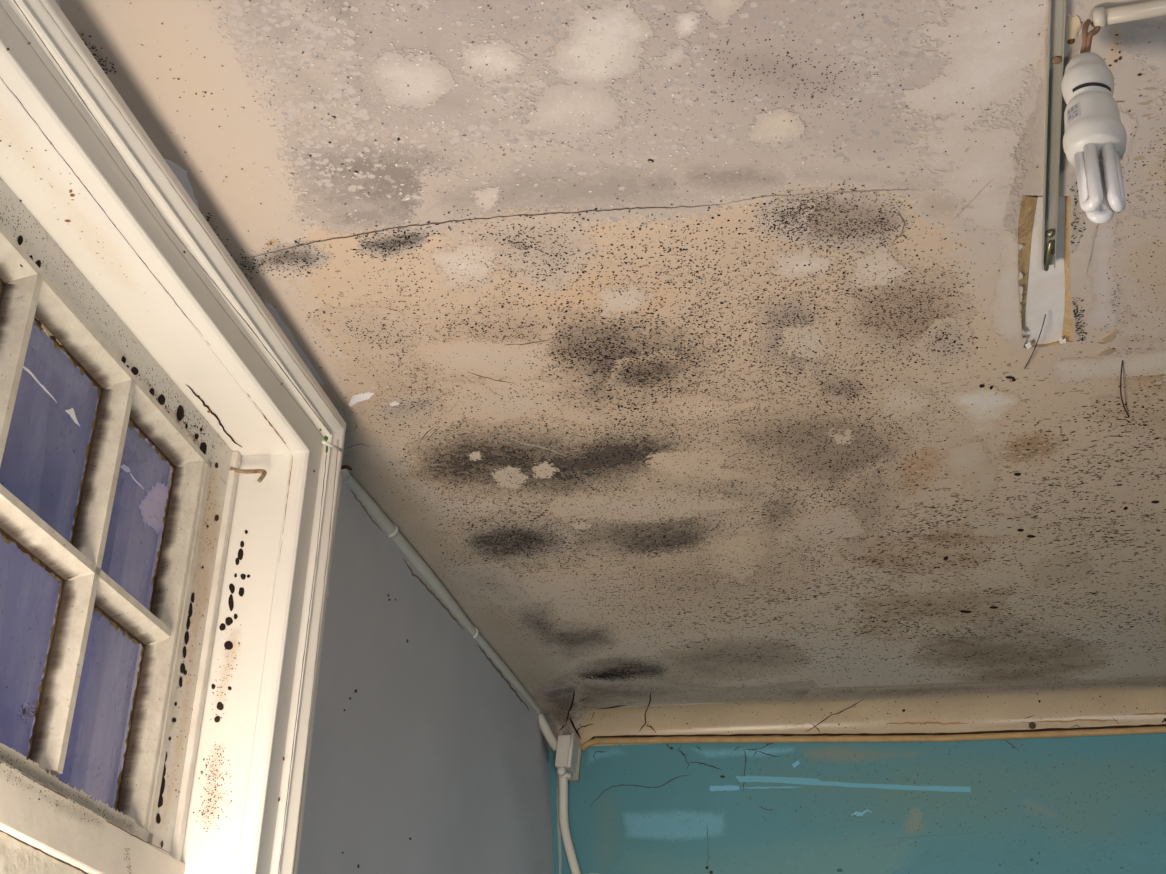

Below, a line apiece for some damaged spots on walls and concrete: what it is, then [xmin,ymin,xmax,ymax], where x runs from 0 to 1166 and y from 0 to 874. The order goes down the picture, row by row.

crack [237,189,919,260]
damp [75,0,1166,740]
damp [0,98,250,874]
crack [559,689,581,739]
crack [591,749,772,811]